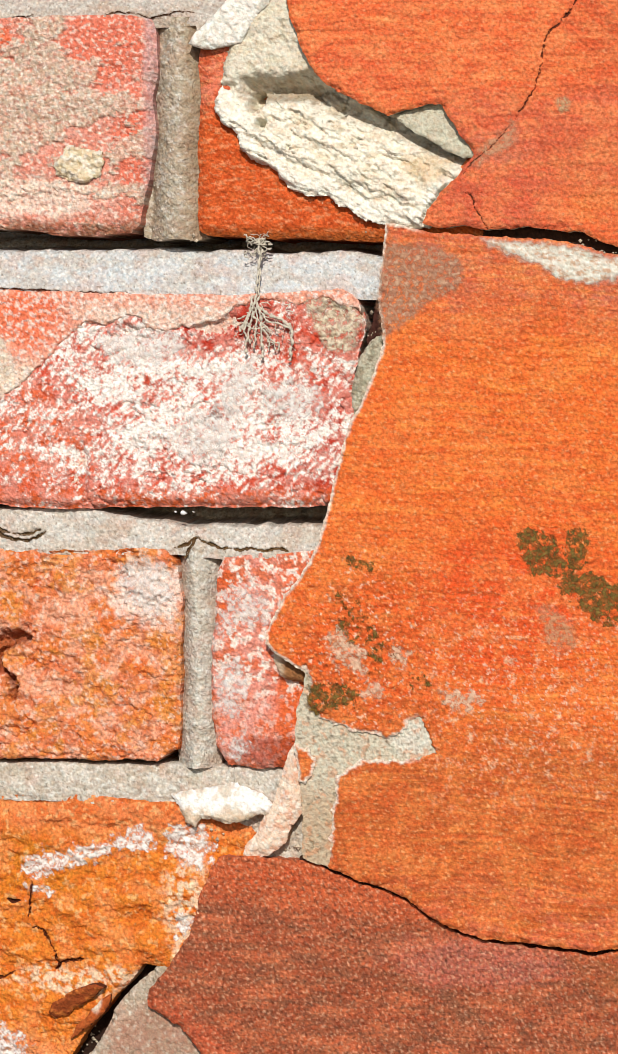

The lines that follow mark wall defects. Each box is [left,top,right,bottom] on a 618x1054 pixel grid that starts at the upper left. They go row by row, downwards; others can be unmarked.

spalling [188,0,474,229]
crack [463,0,618,254]
spalling [0,297,367,509]
spalling [0,624,36,702]
peeling [327,624,383,701]
peeling [389,646,412,670]
peeling [440,689,484,712]
peeling [243,653,437,867]
crack [299,855,407,899]
crack [7,882,84,969]
peeling [49,982,112,1039]